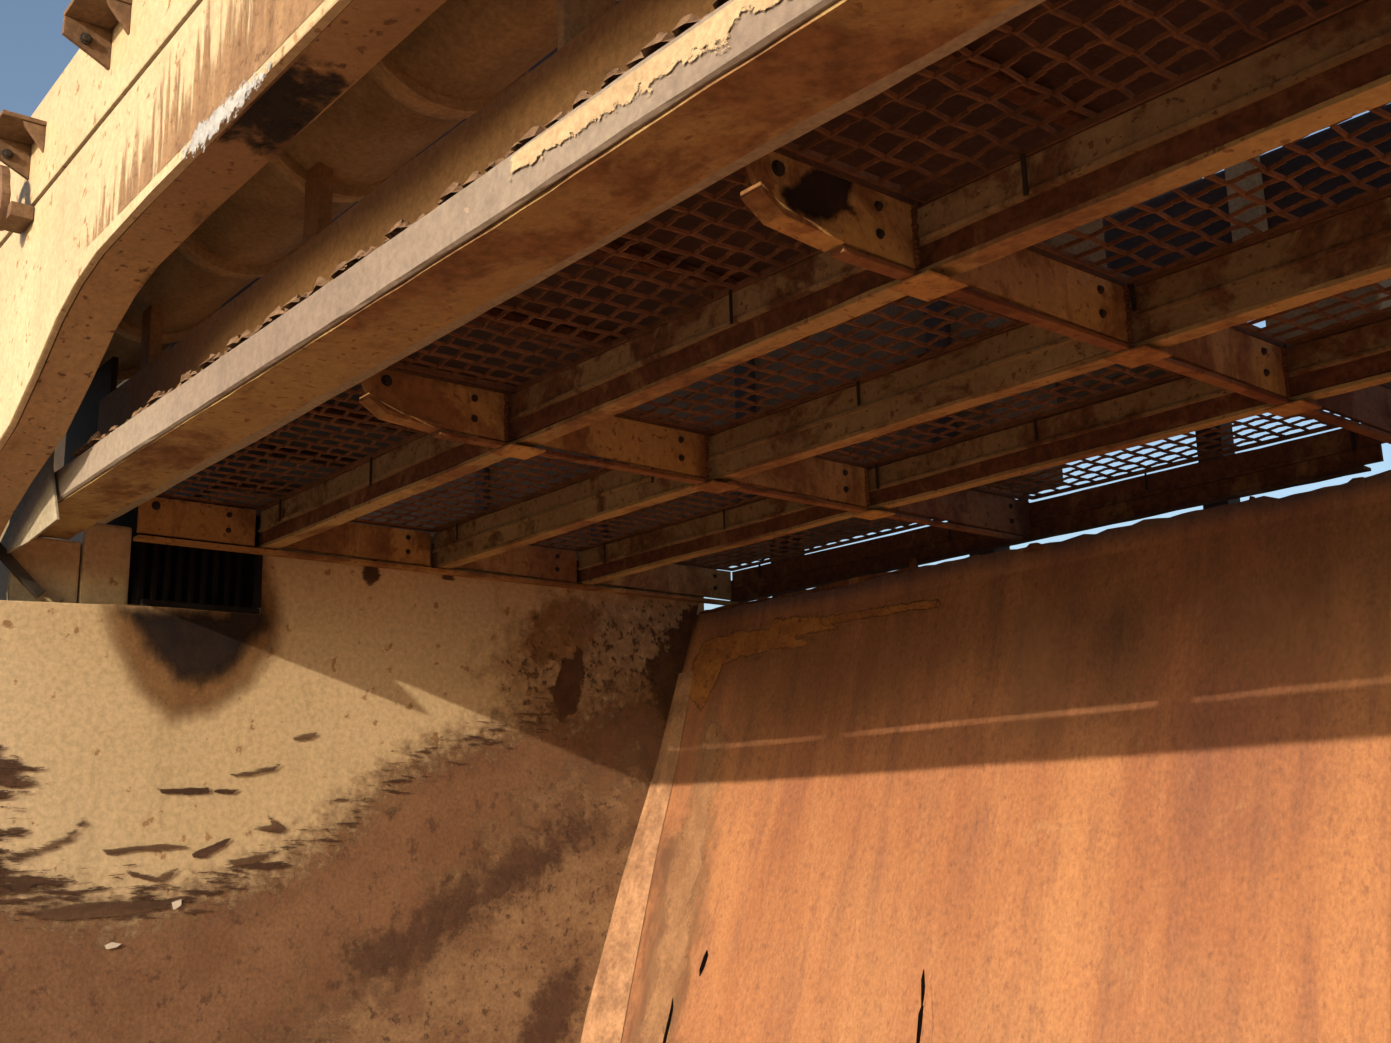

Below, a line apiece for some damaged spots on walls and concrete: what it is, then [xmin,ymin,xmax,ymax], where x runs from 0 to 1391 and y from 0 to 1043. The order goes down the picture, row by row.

peeling [507,0,779,181]
damp [229,849,276,866]
damp [127,868,178,882]
damp [33,900,175,921]
crack [916,969,933,1043]